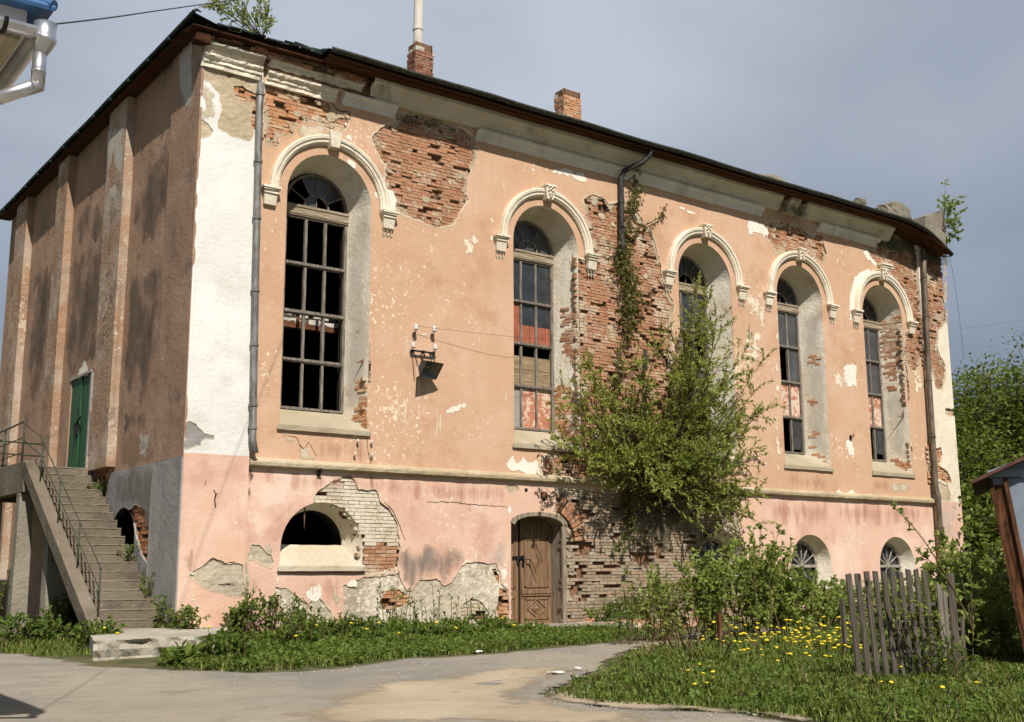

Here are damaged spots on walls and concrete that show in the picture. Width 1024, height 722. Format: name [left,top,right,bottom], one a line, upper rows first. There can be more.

spalling [201,23,375,149]
damp [107,125,124,173]
damp [134,163,168,236]
spalling [371,112,479,247]
damp [30,269,50,367]
damp [68,261,100,360]
damp [125,284,156,387]
flaking render [185,392,215,450]
spalling [507,194,747,623]
peeling [832,364,857,389]
spalling [850,231,948,417]
flaking render [188,474,513,632]